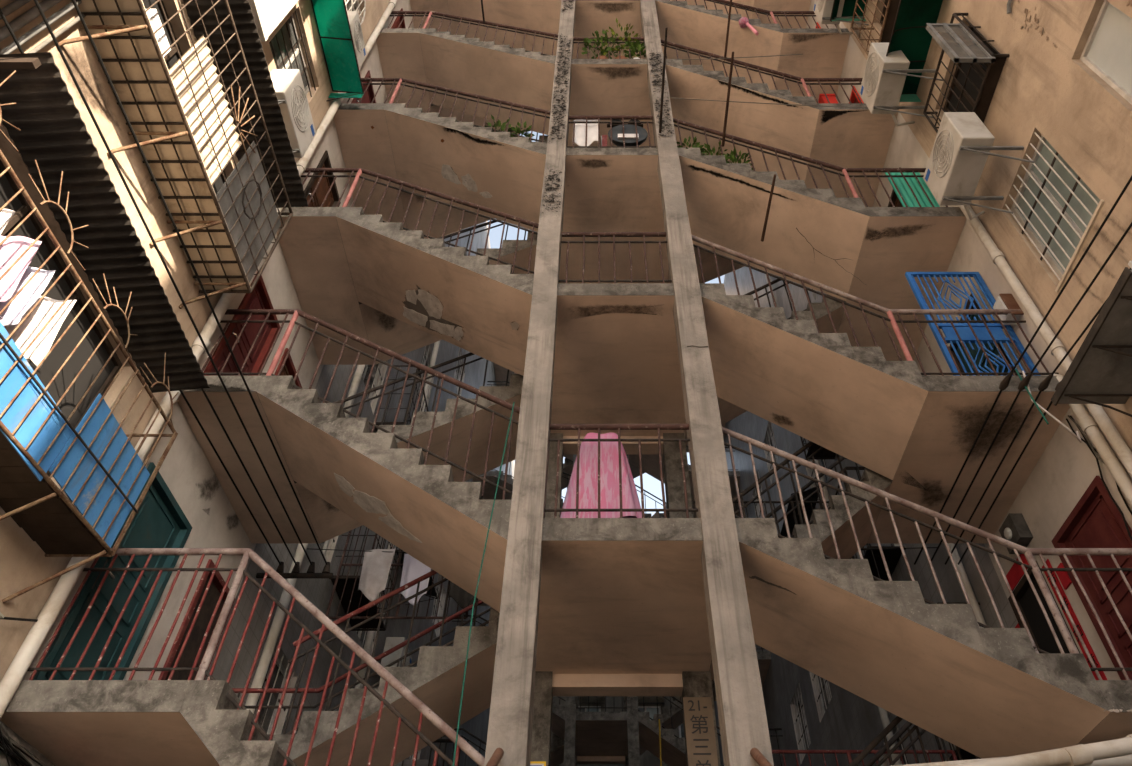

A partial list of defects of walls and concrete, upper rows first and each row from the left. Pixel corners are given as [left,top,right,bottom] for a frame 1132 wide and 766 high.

water stain [548,33,571,143]
water stain [542,170,562,213]
flaking render [402,287,464,341]